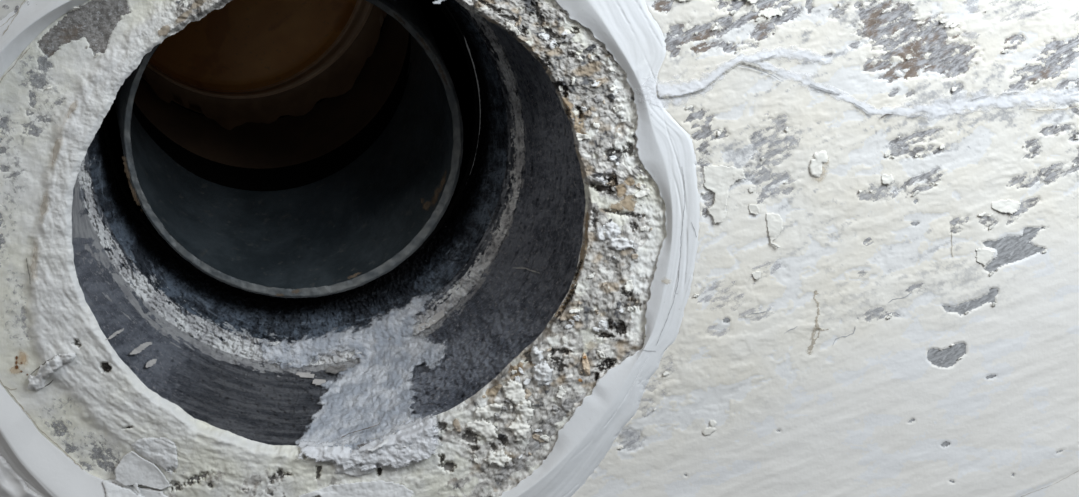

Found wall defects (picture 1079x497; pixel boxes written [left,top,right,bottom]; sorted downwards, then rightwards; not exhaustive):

peeling [21,0,131,137]
peeling [652,0,813,57]
crack [638,47,1079,119]
peeling [830,0,977,97]
peeling [1005,35,1079,115]
water stain [611,177,636,212]
peeling [684,105,797,248]
peeling [885,129,945,159]
peeling [1023,124,1079,158]
water stain [555,212,589,316]
peeling [942,154,1079,316]
peeling [927,343,966,368]